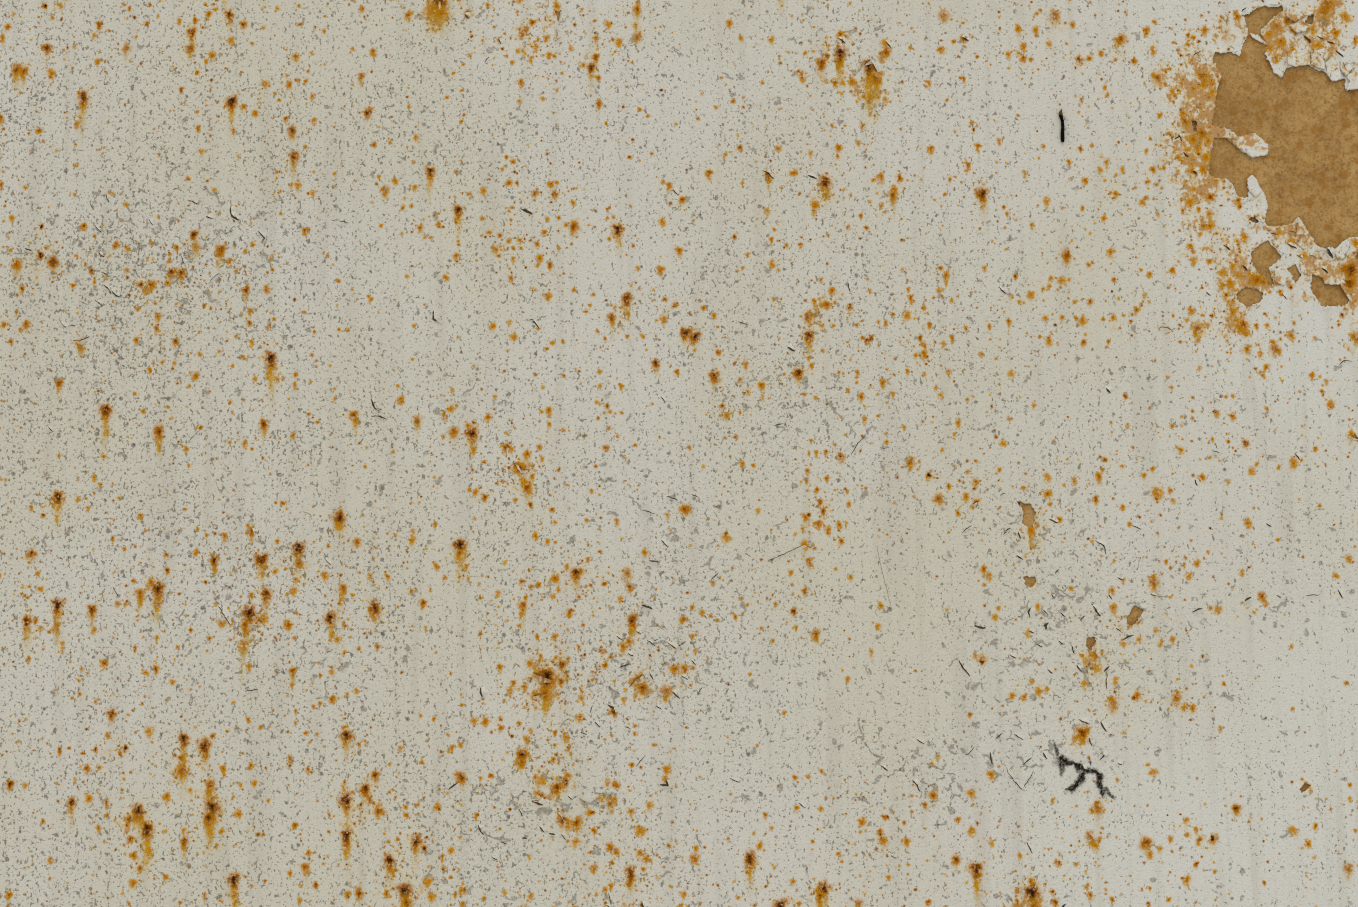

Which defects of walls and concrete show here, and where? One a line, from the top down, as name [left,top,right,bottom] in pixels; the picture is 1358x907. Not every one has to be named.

peeling [1189,2,1358,307]
crack [963,493,1059,560]
peeling [996,502,1036,529]
crack [1010,522,1157,689]
crack [1193,608,1204,617]
crack [959,625,986,676]
crack [882,763,923,791]
crack [965,716,1123,799]
rust [1288,824,1318,889]